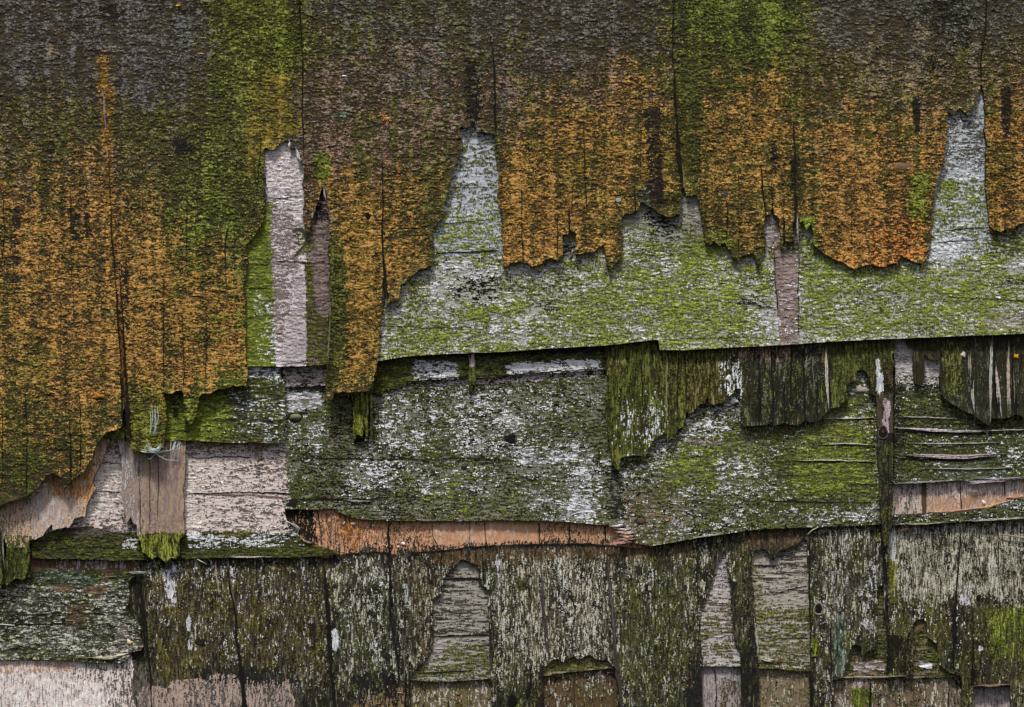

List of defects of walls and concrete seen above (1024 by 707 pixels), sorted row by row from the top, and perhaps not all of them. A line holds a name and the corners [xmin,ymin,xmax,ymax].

crack [108,149,130,435]
damp [0,0,698,537]
peeling [353,560,492,707]
peeling [0,85,1024,572]
damp [0,249,1024,707]